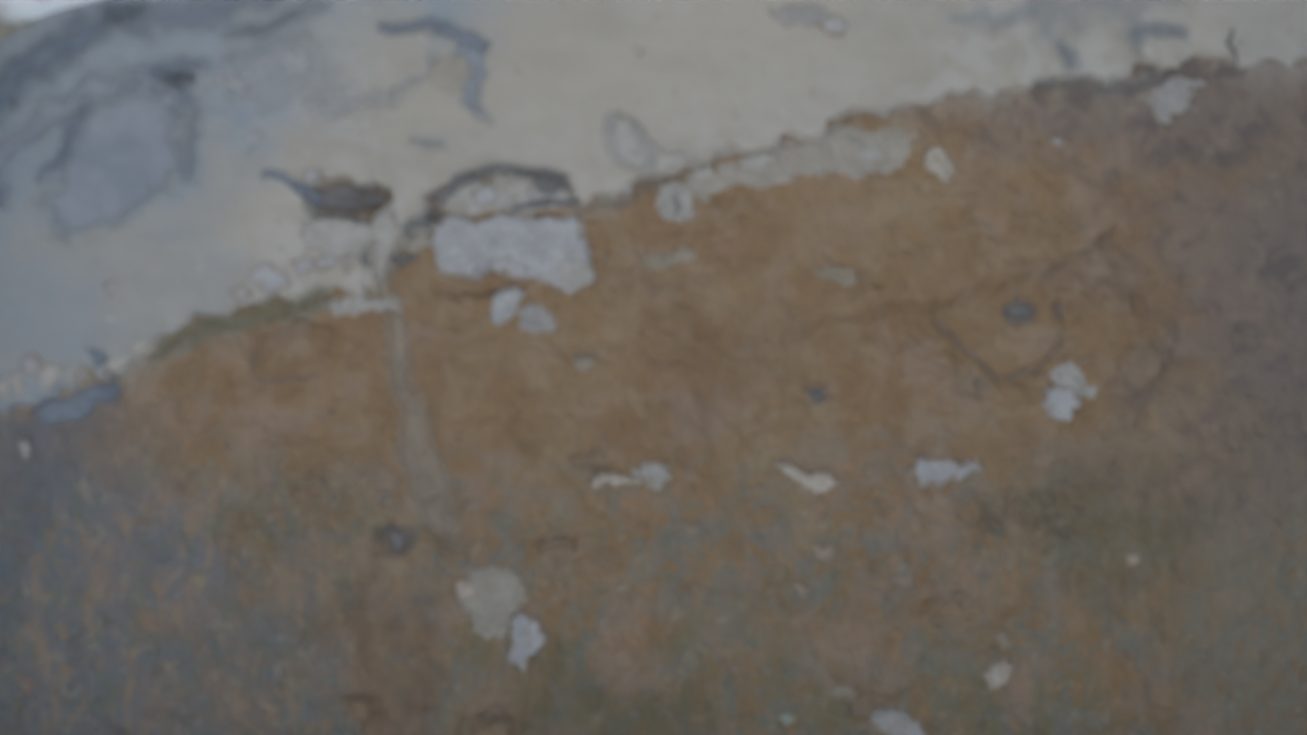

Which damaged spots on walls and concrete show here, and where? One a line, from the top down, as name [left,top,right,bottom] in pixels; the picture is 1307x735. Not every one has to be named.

damp [0,0,248,108]
damp [0,58,201,237]
peeling [601,109,717,181]
spalling [922,145,955,184]
spalling [263,164,600,335]
spalling [1040,362,1099,423]
spalling [591,461,672,491]
spalling [774,458,844,495]
spalling [908,454,985,489]
spalling [454,565,548,672]
spalling [980,626,1014,691]
spalling [869,704,928,735]